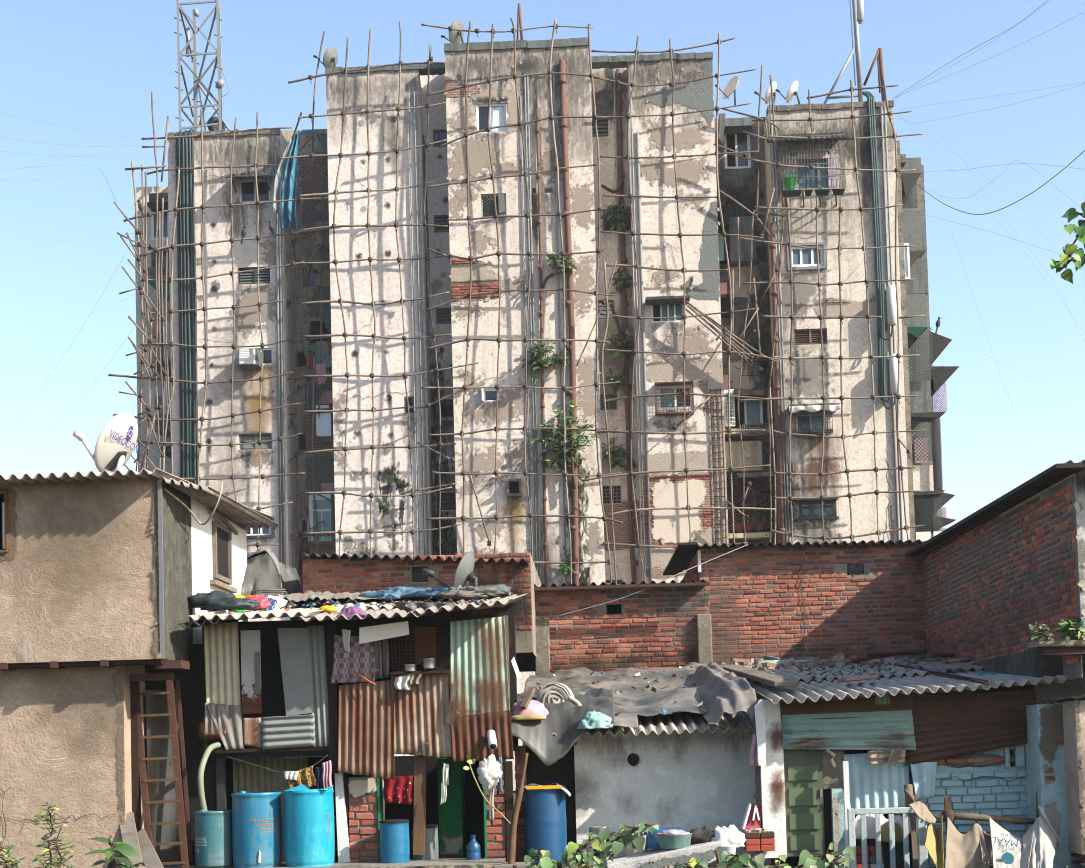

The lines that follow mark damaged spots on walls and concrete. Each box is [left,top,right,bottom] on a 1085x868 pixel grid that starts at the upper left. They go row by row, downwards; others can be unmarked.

spalling [431,73,596,328]
peeling [634,111,721,225]
peeling [648,264,694,294]
damp [376,485,406,541]
flaking render [582,471,714,567]
flaking render [646,567,687,579]
peeling [1076,525,1085,616]
corrosion [478,625,505,712]
crack [0,788,114,849]